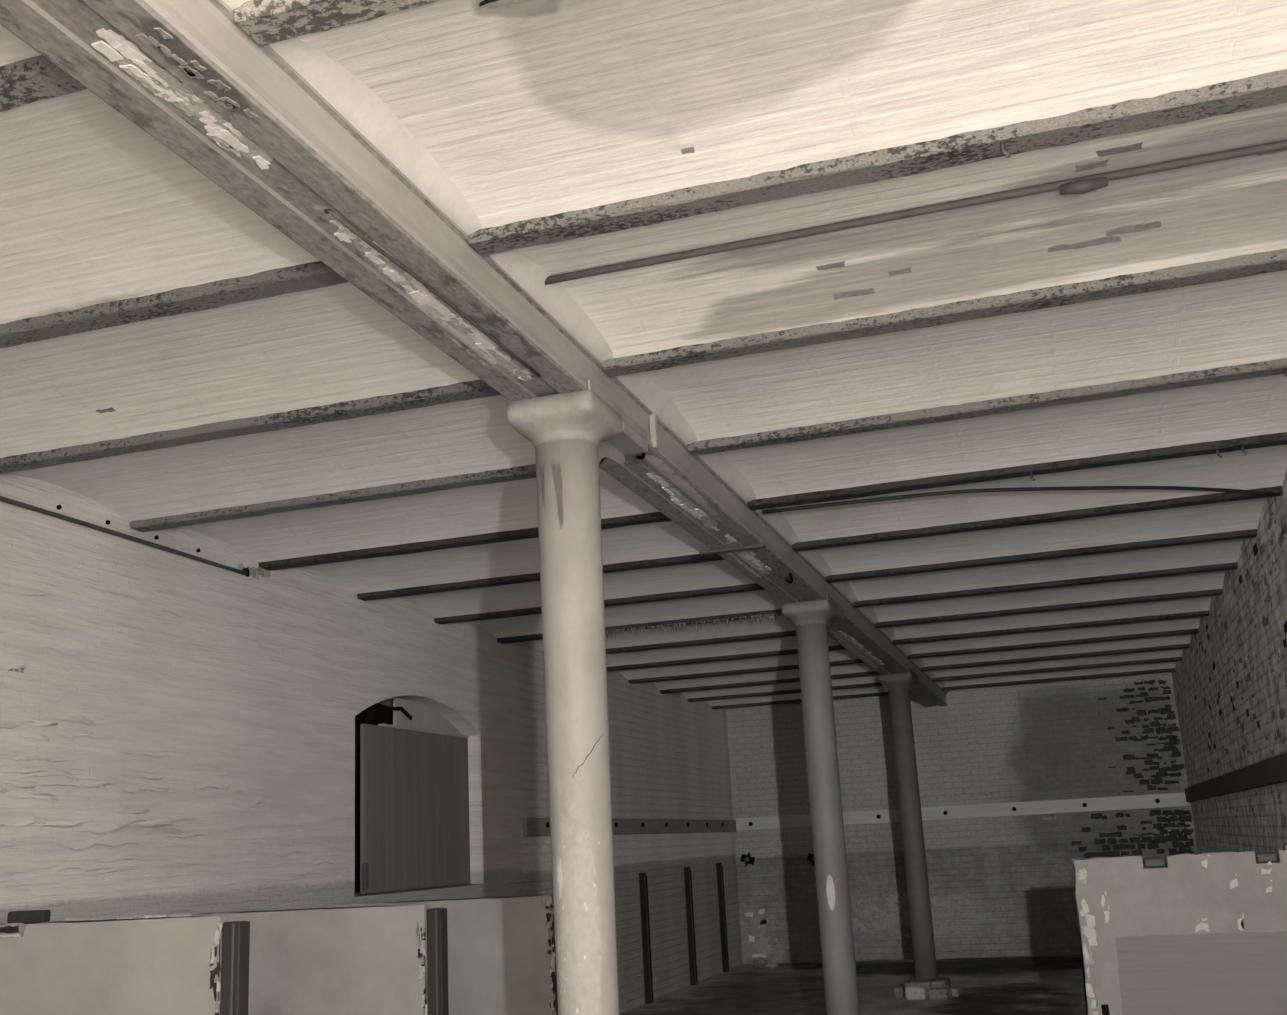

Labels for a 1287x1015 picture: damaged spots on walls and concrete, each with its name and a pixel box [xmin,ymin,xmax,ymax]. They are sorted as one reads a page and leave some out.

spalling [479,0,534,9]
peeling [92,28,272,170]
peeling [1190,512,1287,777]
peeling [1098,680,1184,792]
peeling [1071,809,1211,883]
peeling [1195,918,1209,933]